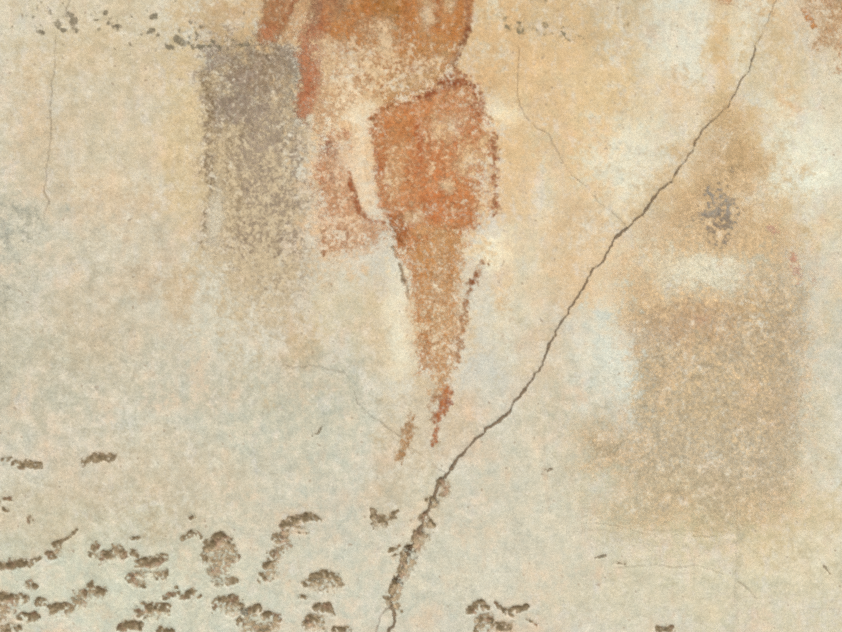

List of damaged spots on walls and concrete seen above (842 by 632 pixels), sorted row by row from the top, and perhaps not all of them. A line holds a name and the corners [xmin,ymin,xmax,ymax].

crack [383,126,707,632]
spalling [1,457,43,470]
spalling [81,452,116,467]
spalling [0,528,78,570]
spalling [0,579,107,632]
spalling [88,536,168,588]
spalling [116,586,202,632]
spalling [180,530,282,632]
spalling [257,512,322,584]
spalling [300,569,345,599]
spalling [302,602,352,632]
spalling [466,599,530,632]